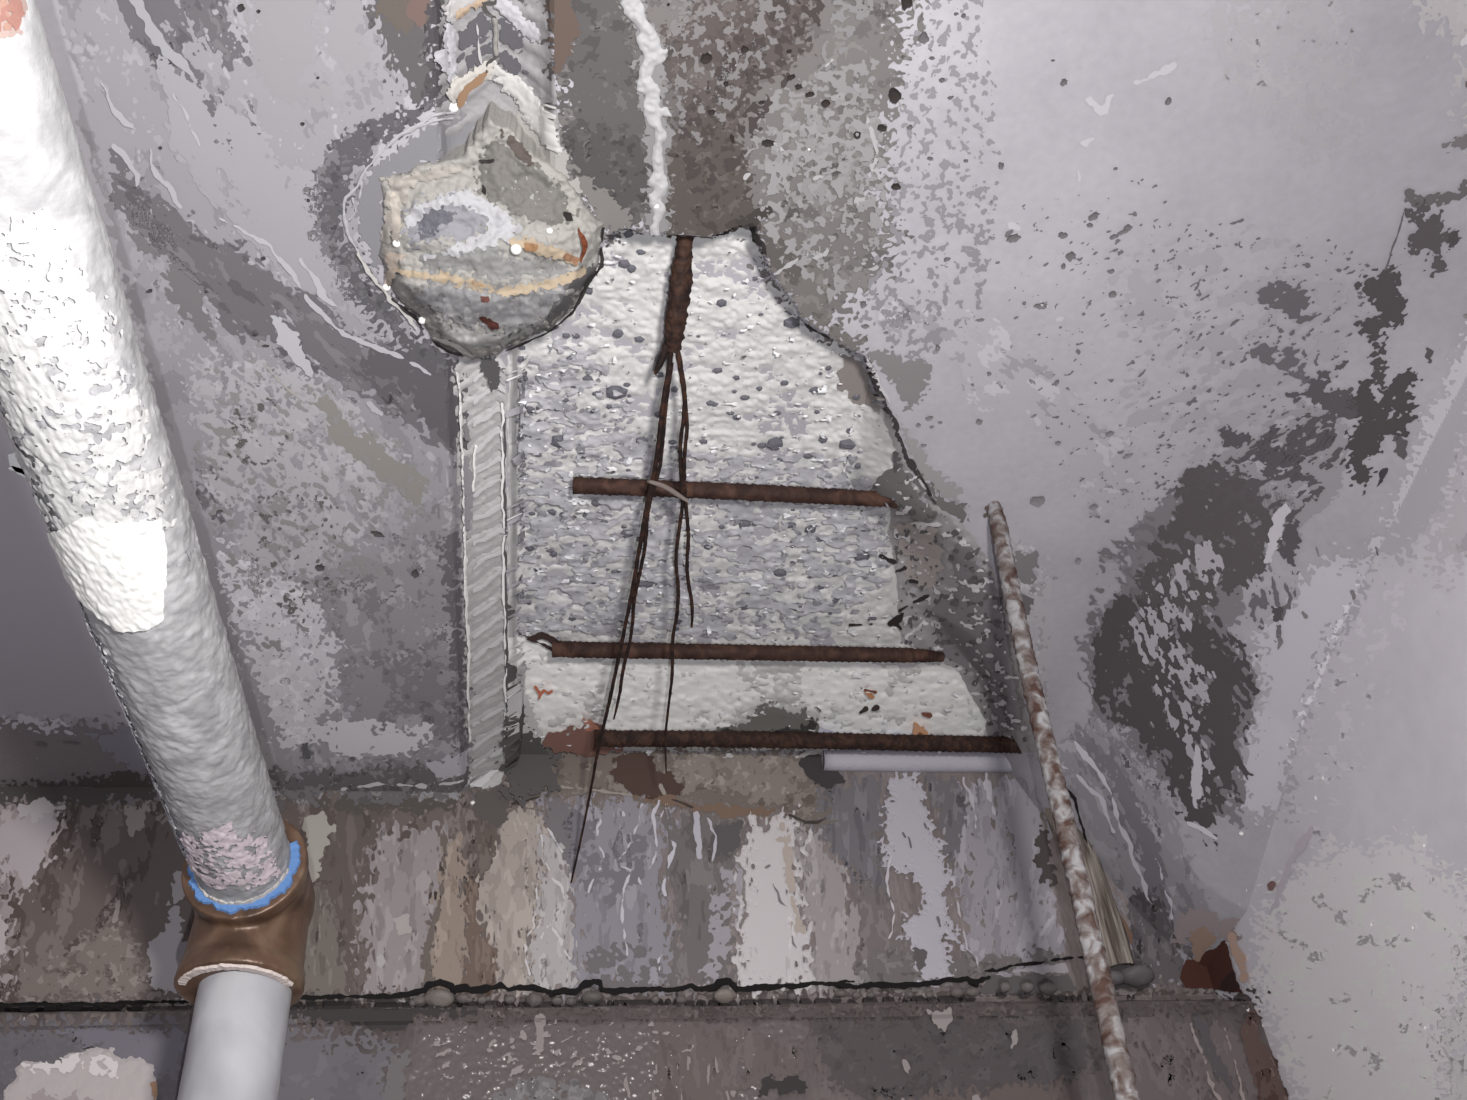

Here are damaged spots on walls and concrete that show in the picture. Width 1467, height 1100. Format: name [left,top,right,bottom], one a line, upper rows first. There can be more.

damp [1183,0,1379,177]
damp [1403,0,1467,155]
damp [1163,224,1230,302]
damp [1404,179,1467,278]
spalling [500,224,1140,1100]
corrosion [859,689,880,714]
corrosion [912,712,932,735]
damp [1056,257,1467,1100]
crack [0,1000,189,1012]
damp [0,711,195,1100]
crack [300,956,1083,1001]
corrosion [1170,908,1249,993]